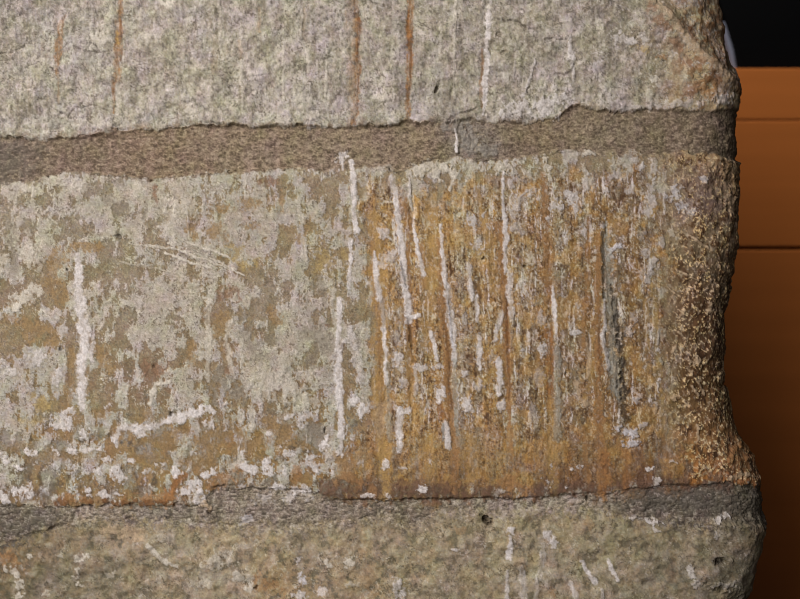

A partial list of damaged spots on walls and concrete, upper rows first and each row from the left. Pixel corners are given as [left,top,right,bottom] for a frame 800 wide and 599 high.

corrosion [53,14,68,106]
corrosion [109,0,125,116]
corrosion [343,0,364,126]
corrosion [404,0,416,120]
water stain [544,148,737,245]
efflorescence [0,251,228,505]
water stain [203,114,594,525]
corrosion [315,150,756,514]
efflorescence [611,404,658,449]